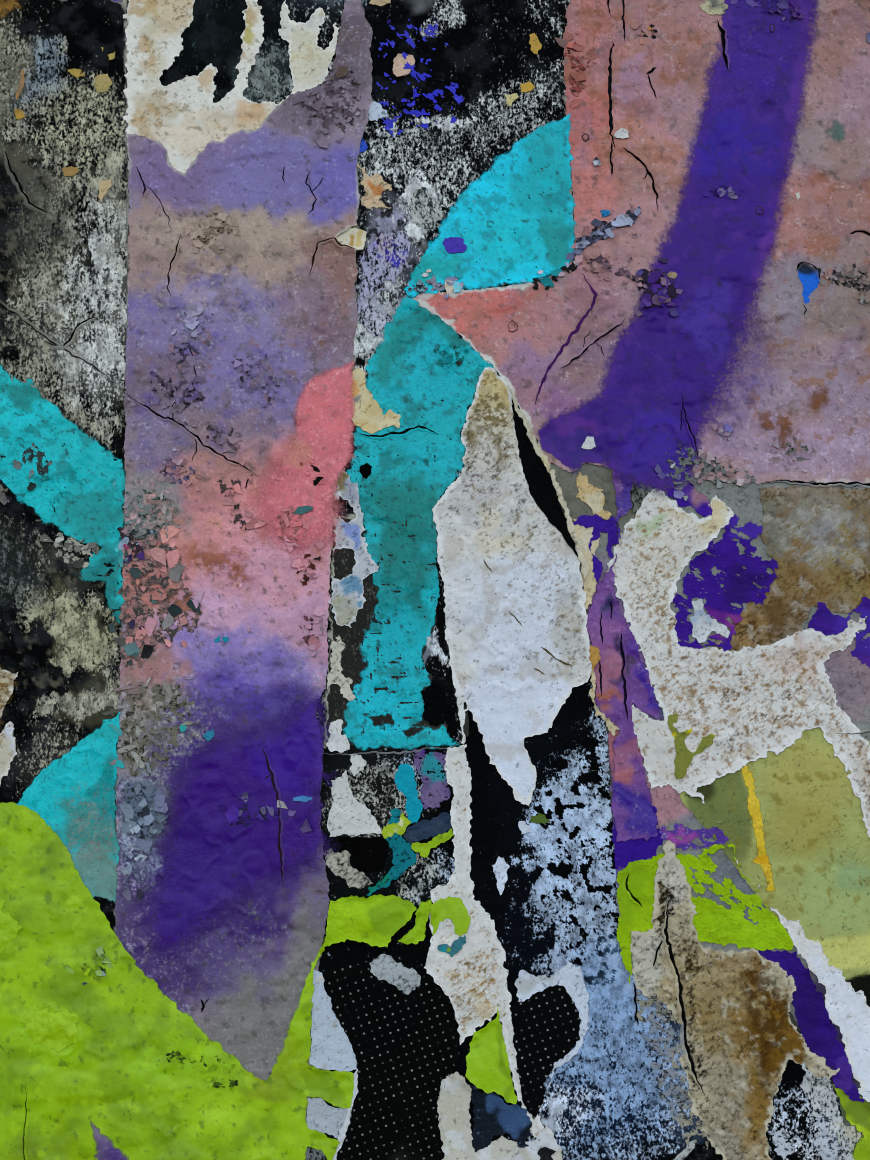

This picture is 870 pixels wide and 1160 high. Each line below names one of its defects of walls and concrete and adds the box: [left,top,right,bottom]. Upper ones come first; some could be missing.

peeling [293,66,366,148]
crack [604,0,661,211]
crack [282,166,323,214]
peeling [520,204,683,317]
crack [535,273,626,404]
crack [123,341,259,489]
peeling [143,299,326,656]
peeling [39,532,101,569]
peeling [102,448,204,900]
crack [261,745,285,887]
crack [622,873,705,1096]
crack [21,1083,29,1160]